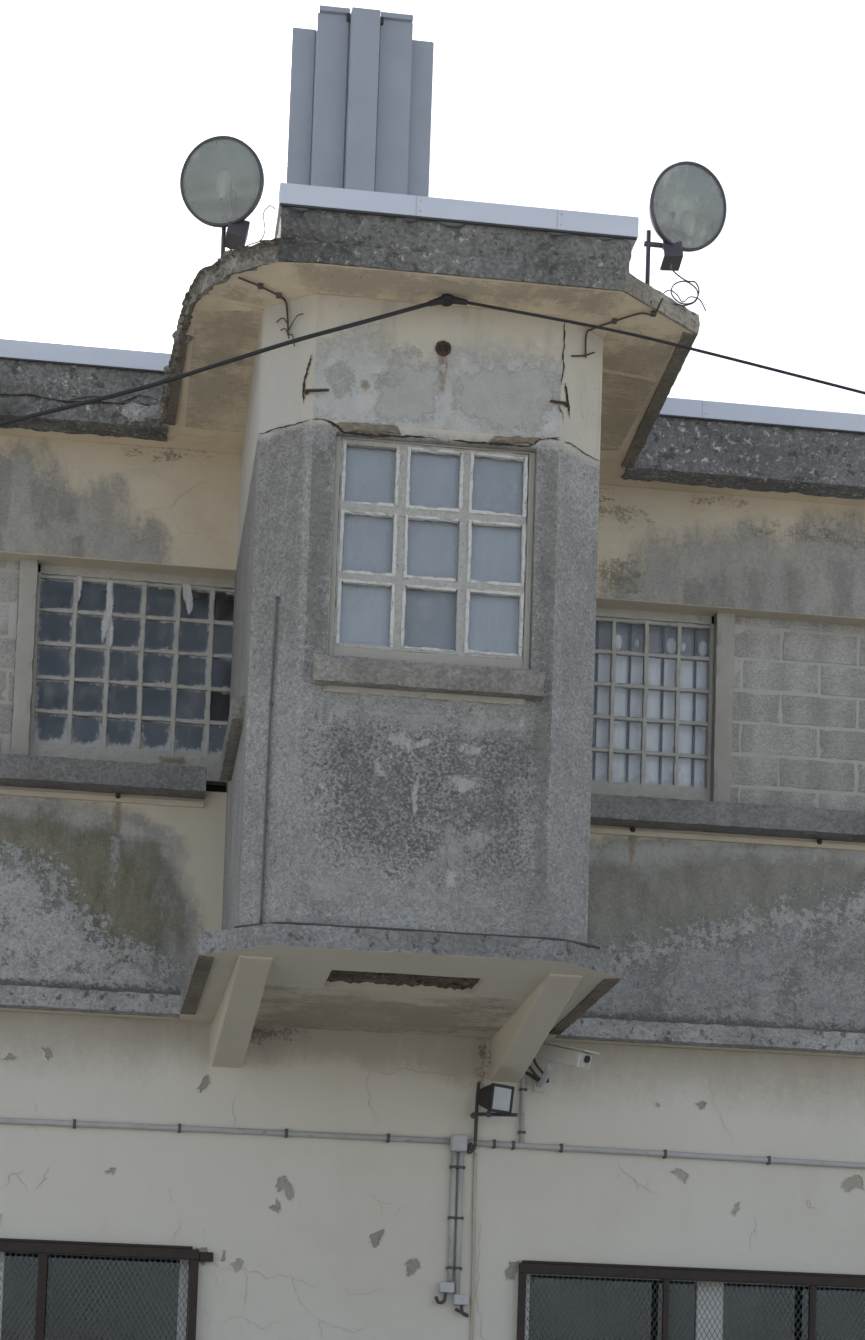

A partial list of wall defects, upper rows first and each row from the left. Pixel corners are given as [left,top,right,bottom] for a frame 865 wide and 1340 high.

spalling [115,238,324,426]
peeling [314,328,561,447]
crack [540,322,625,459]
leakage [0,448,164,564]
leakage [602,513,865,618]
leakage [0,796,193,995]
peeling [268,1174,294,1215]
peeling [369,1229,384,1248]
peeling [403,1257,422,1278]
peeling [669,1167,690,1184]